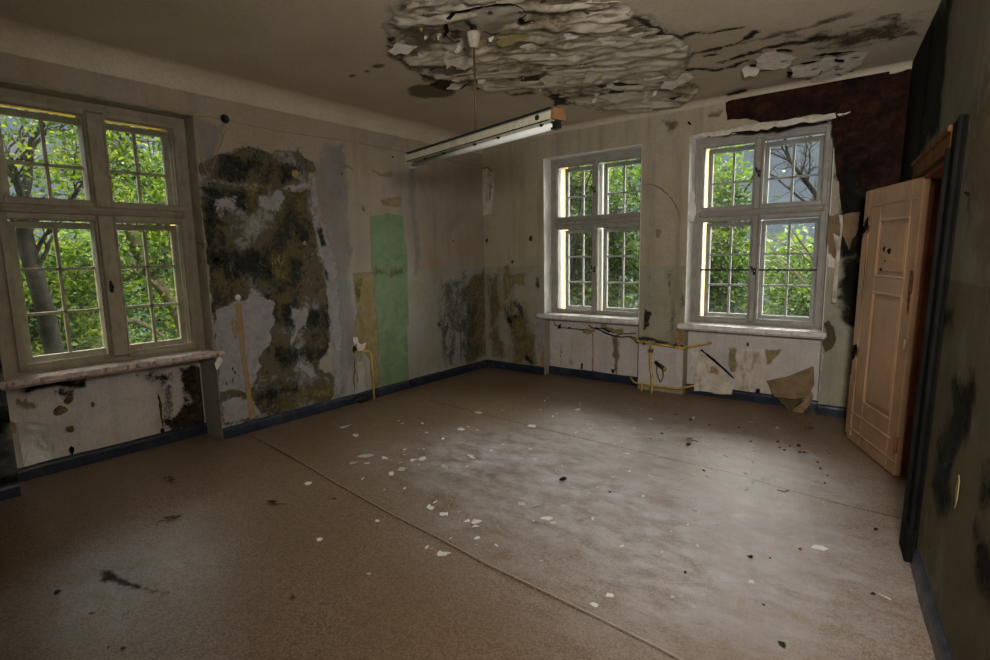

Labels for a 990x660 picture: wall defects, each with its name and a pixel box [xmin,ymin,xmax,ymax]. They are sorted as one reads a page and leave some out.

peeling [382,0,699,113]
water stain [632,0,952,183]
peeling [666,49,912,401]
water stain [0,355,21,492]
flaking render [213,287,275,425]
water stain [438,265,535,366]
water stain [931,376,976,515]